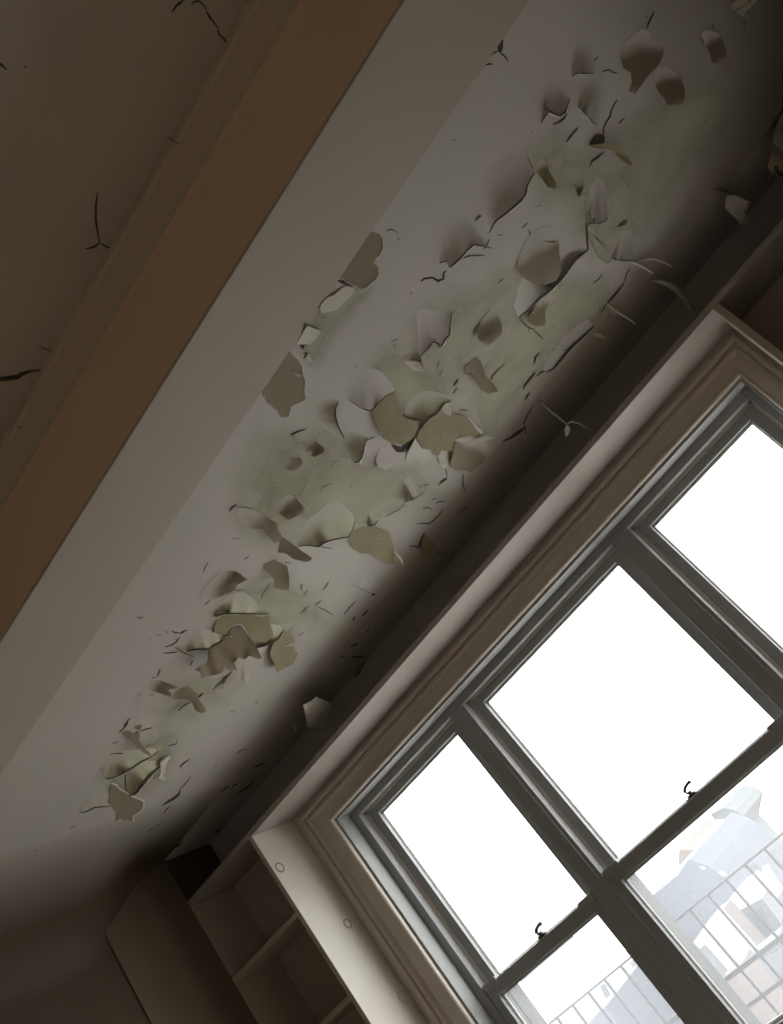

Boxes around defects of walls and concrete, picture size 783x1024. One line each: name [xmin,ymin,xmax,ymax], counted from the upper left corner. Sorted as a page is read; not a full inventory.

crack [172,0,226,42]
peeling [620,12,685,107]
crack [86,193,110,250]
peeling [516,226,561,327]
flaking render [262,231,385,419]
crack [0,345,52,381]
peeling [359,390,495,472]
peeling [229,493,312,590]
peeling [200,569,248,601]
peeling [194,613,298,678]
peeling [150,669,206,713]
peeling [303,697,331,733]